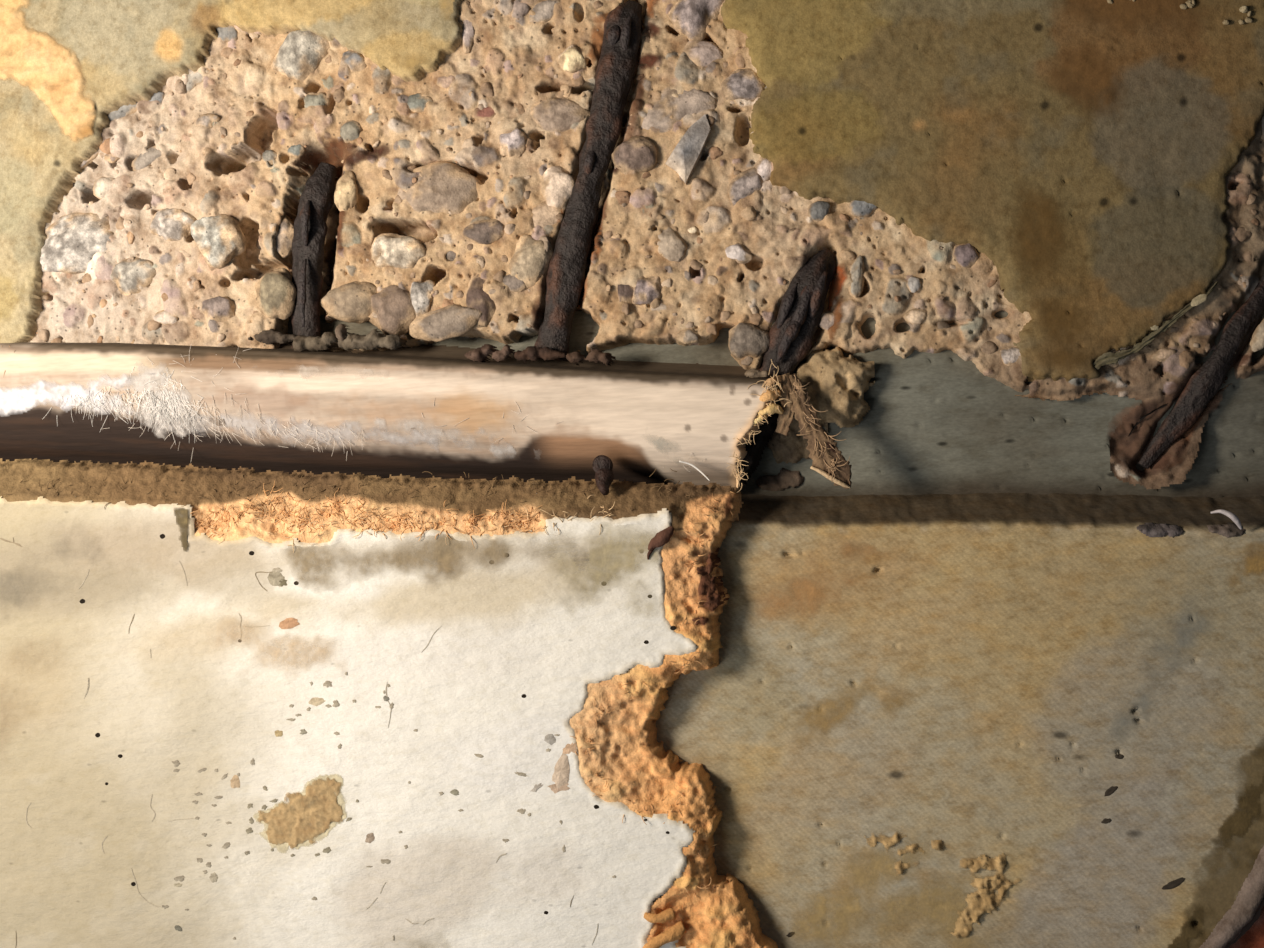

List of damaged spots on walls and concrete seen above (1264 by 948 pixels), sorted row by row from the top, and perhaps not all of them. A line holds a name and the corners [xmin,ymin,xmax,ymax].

leakage [1069,0,1186,25]
rust [621,54,660,138]
rust [293,139,388,181]
rust [325,208,344,291]
spalling [30,0,1264,432]
rust [776,266,846,363]
spalling [1109,413,1209,489]
rust [1107,354,1250,477]
peeling [192,758,255,883]
peeling [246,774,359,857]
spalling [1162,877,1185,890]
leakage [1168,745,1264,948]